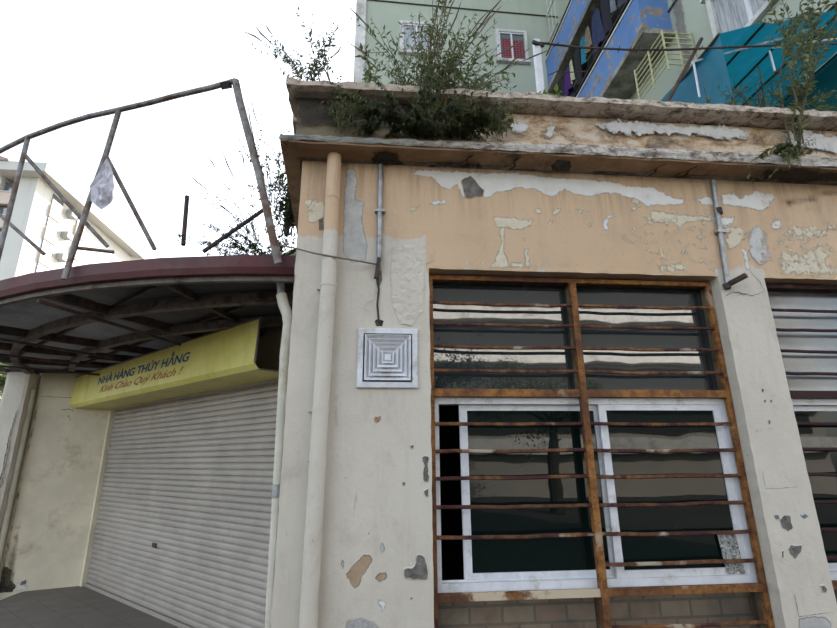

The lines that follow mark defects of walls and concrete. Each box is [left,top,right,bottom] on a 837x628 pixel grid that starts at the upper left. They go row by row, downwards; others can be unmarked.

peeling [509,119,529,136]
peeling [596,118,749,140]
peeling [782,129,837,155]
peeling [412,160,837,278]
spalling [774,514,808,531]
spalling [780,544,802,559]
peeling [341,555,372,588]
spalling [403,554,429,580]